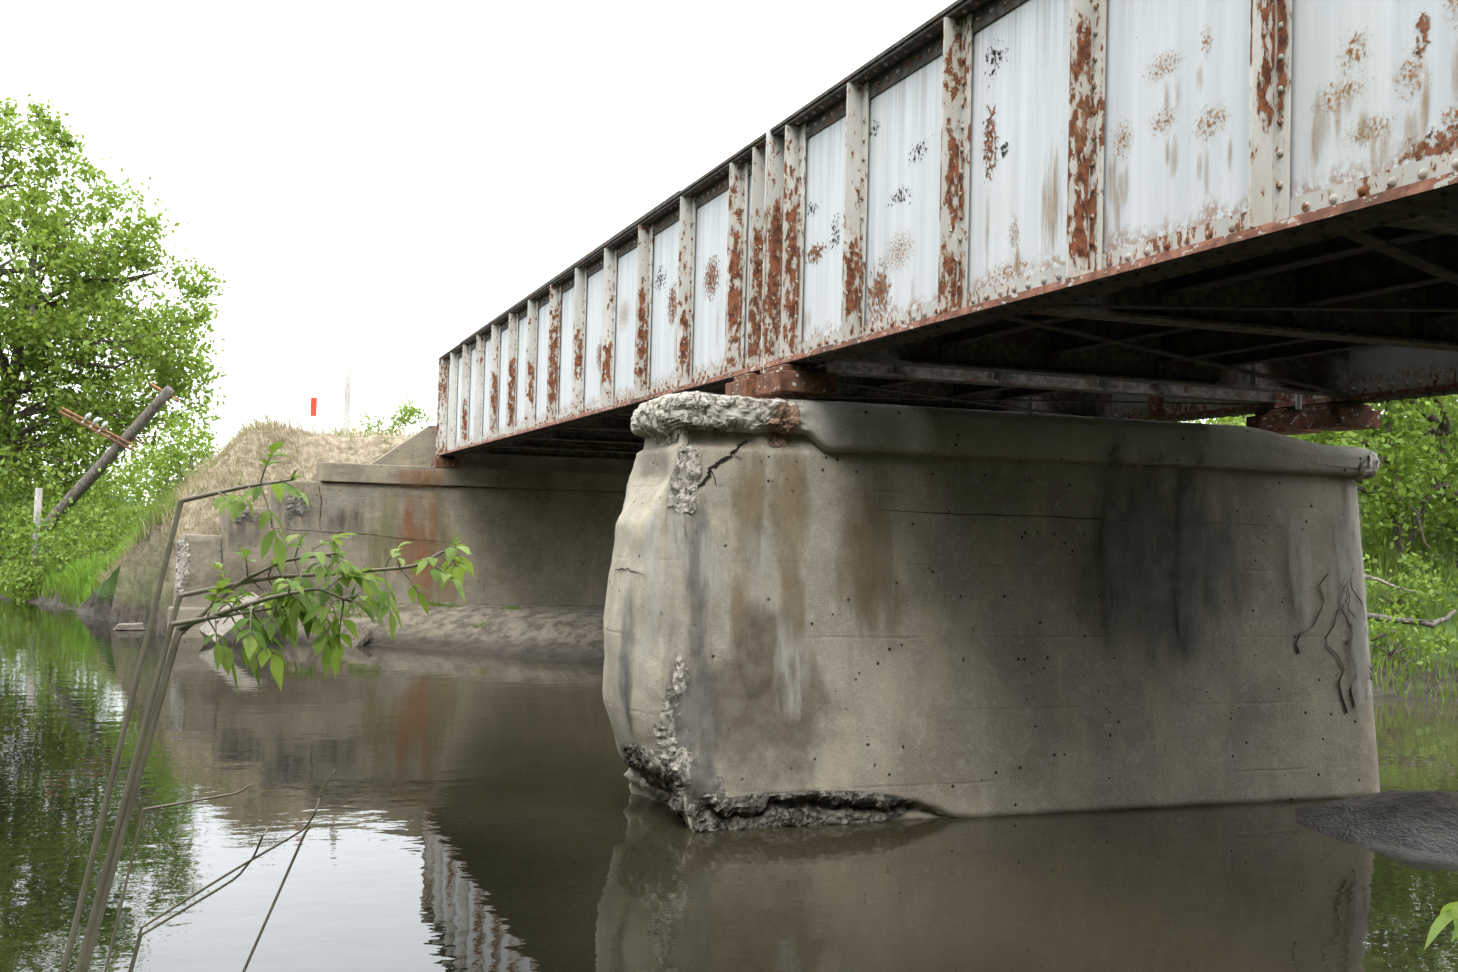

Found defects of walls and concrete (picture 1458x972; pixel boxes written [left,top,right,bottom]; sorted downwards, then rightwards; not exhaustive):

peeling [489,329,612,432]
spalling [634,260,804,514]
damp [648,513,719,643]
damp [671,585,821,803]
spalling [621,653,912,832]